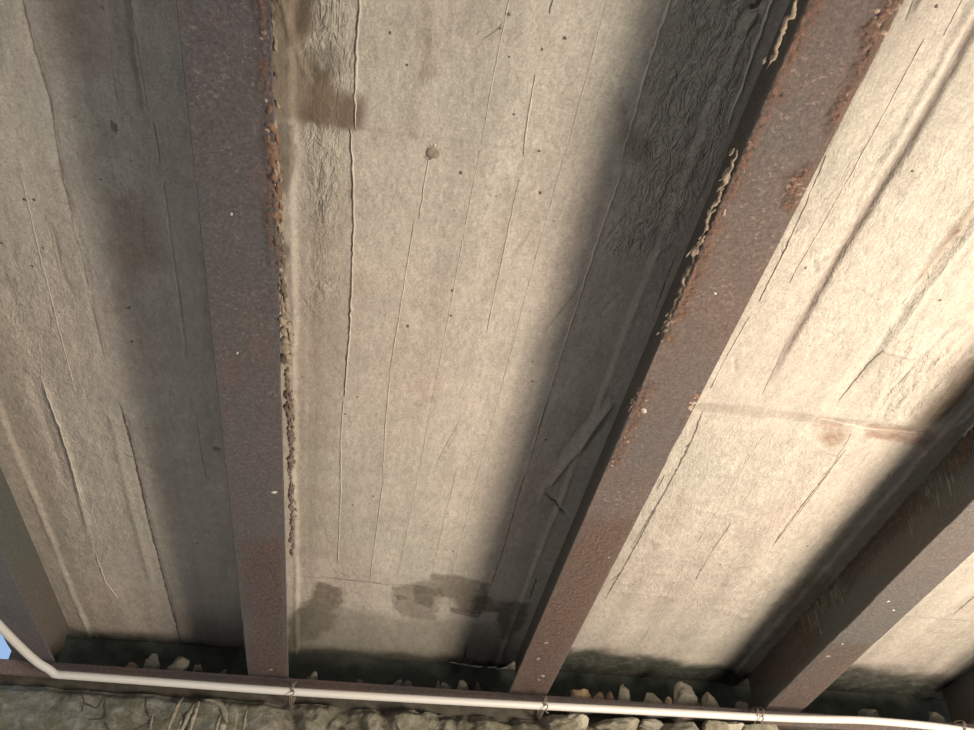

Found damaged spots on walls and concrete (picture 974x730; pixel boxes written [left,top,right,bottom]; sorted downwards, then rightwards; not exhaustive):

corrosion [664,0,824,342]
corrosion [828,83,858,144]
crack [119,402,181,641]
crack [605,412,703,599]
water stain [288,584,509,670]